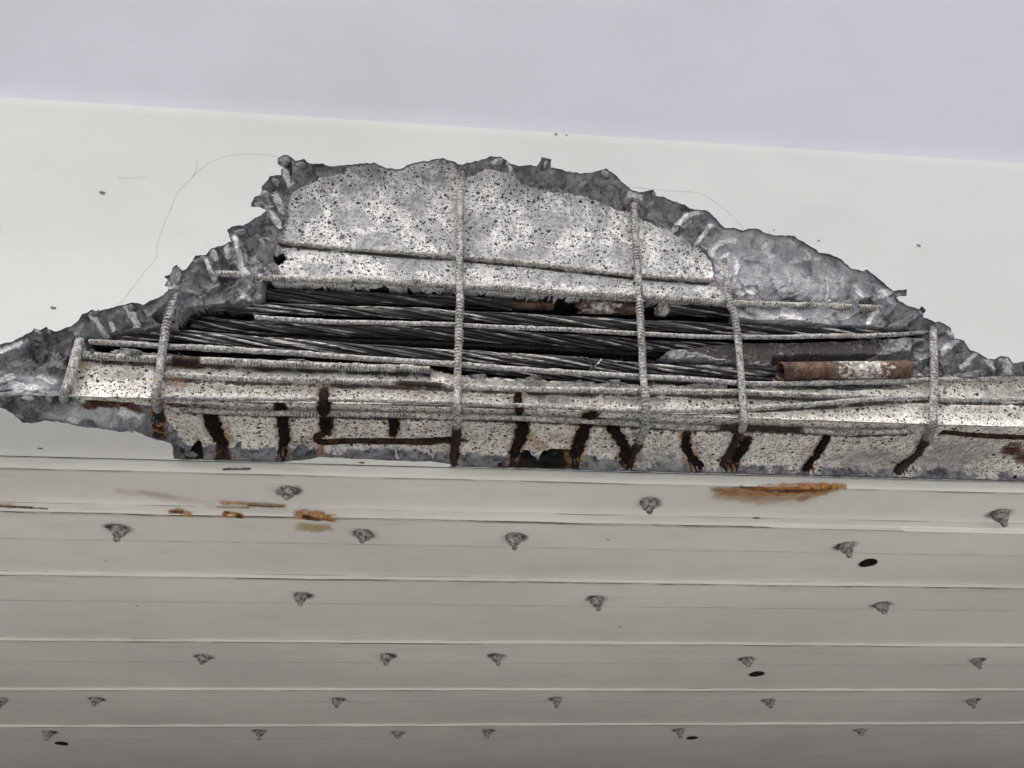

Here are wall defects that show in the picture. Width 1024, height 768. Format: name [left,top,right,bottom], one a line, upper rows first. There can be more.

spalling [0,156,1024,481]
corrosion [1000,443,1024,464]
corrosion [711,483,846,501]
corrosion [220,502,336,532]